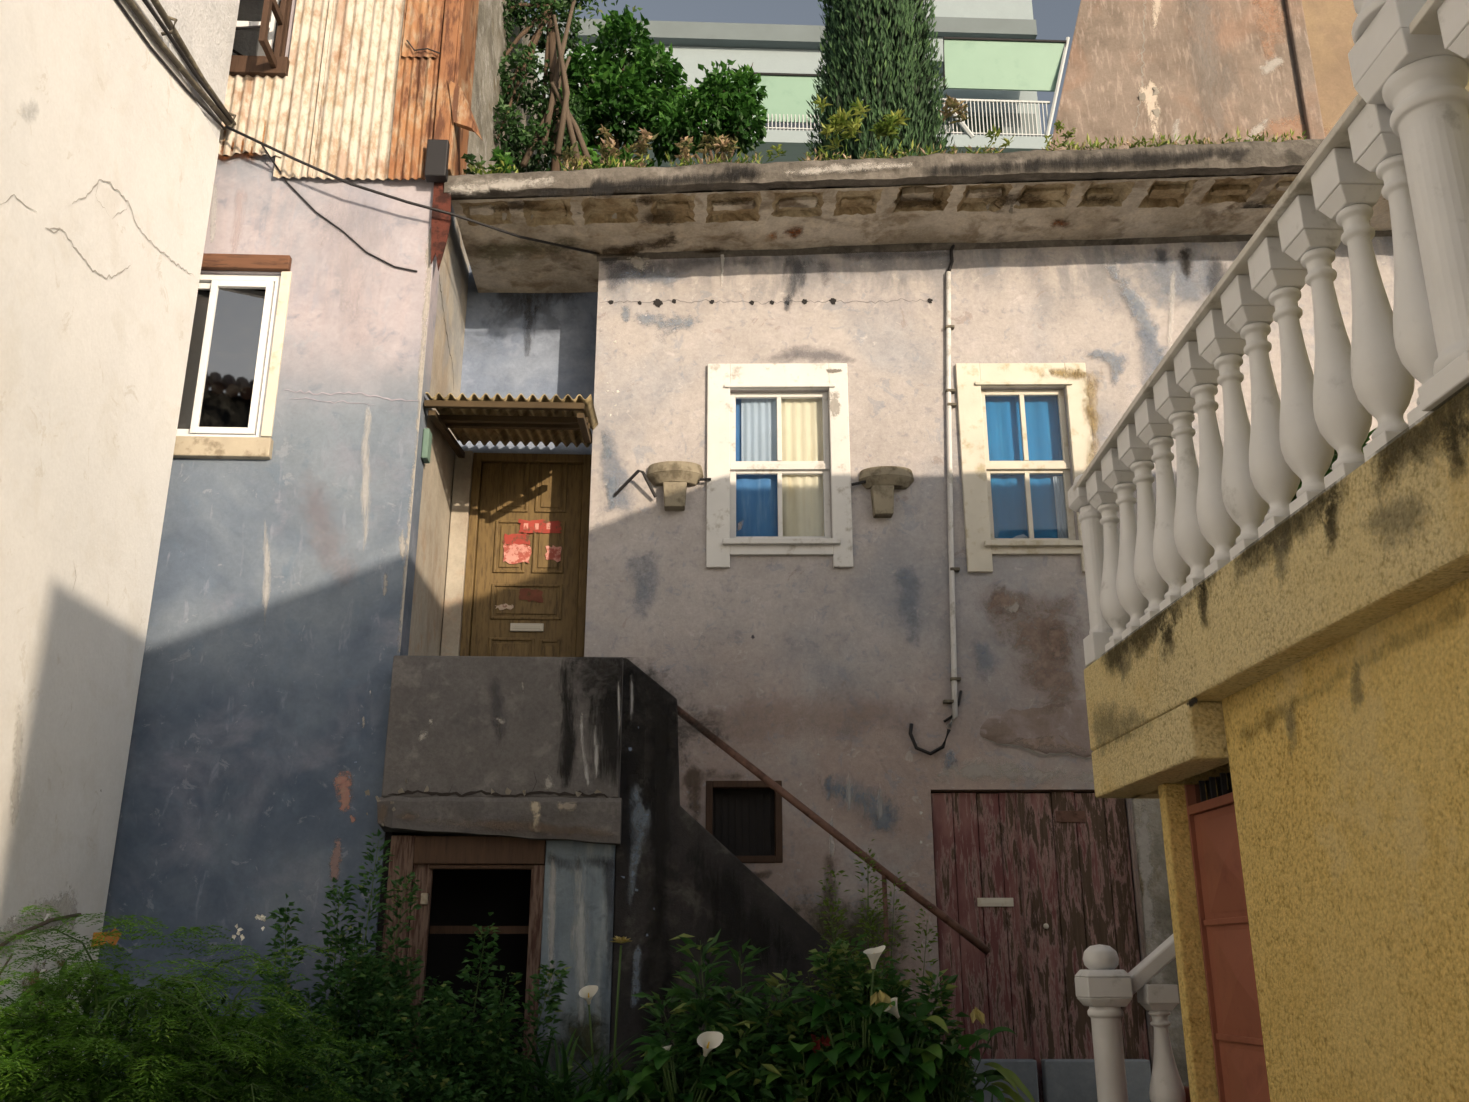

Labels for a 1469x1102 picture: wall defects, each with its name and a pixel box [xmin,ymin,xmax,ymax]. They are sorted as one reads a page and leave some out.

crack [0,179,194,279]
damp [592,211,677,256]
damp [695,248,724,276]
damp [785,259,805,309]
damp [1375,382,1469,484]
damp [1235,478,1342,577]
damp [1103,571,1216,672]
damp [558,669,622,810]
damp [531,801,540,825]